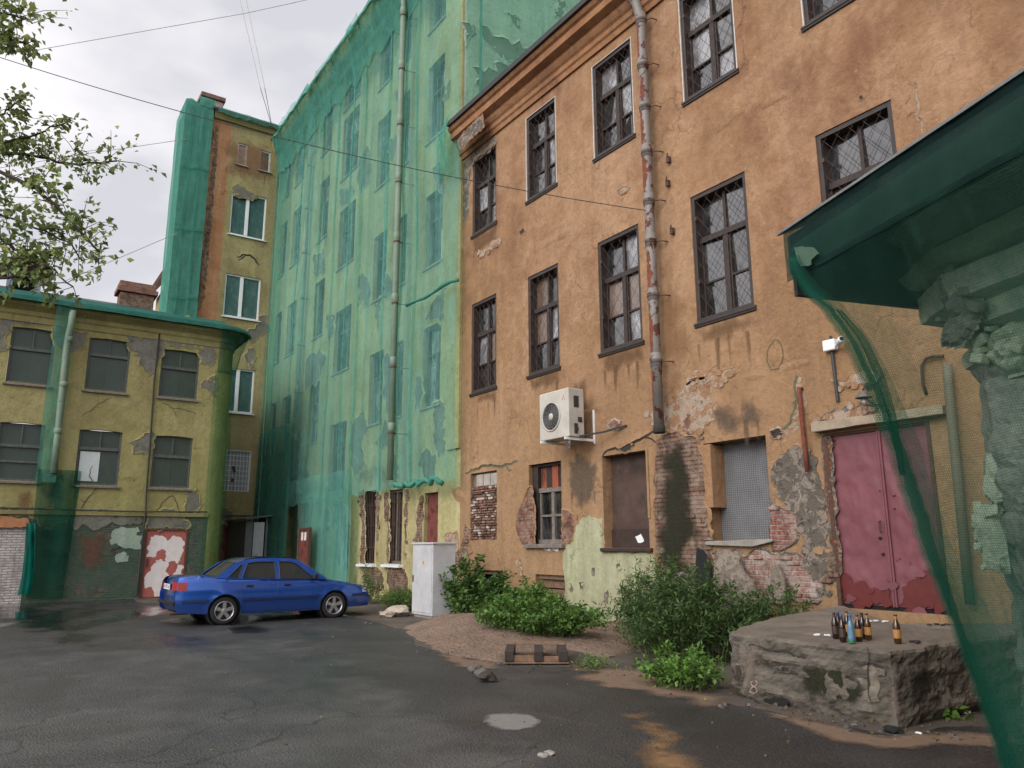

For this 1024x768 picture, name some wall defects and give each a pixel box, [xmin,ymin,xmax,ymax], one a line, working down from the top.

flaking render [457,114,498,223]
corrosion [640,111,650,193]
flaking render [124,335,220,397]
peeling [73,488,204,563]
water stain [659,445,697,577]
flaking render [515,366,947,615]